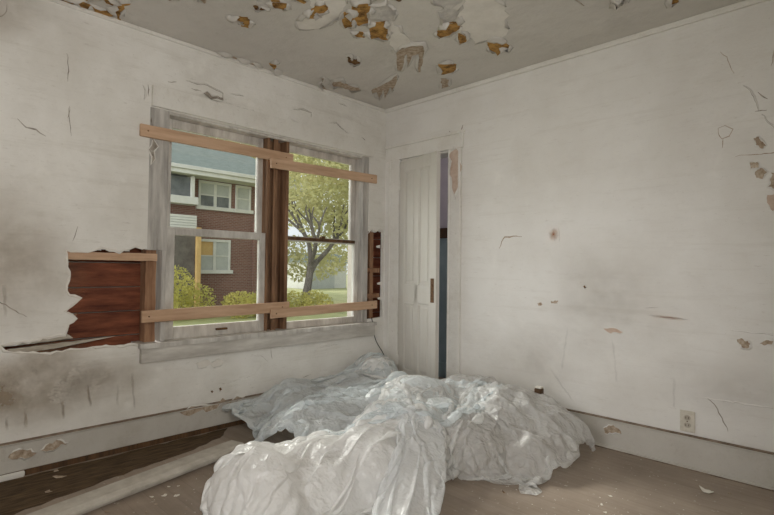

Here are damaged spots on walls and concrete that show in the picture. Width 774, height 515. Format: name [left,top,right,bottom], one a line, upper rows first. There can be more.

peeling [62,0,133,20]
peeling [216,0,429,101]
peeling [436,60,459,89]
peeling [430,0,513,56]
spalling [754,136,768,150]
spalling [749,161,774,212]
spalling [0,245,143,356]
spalling [736,338,774,350]
peeling [0,428,227,515]